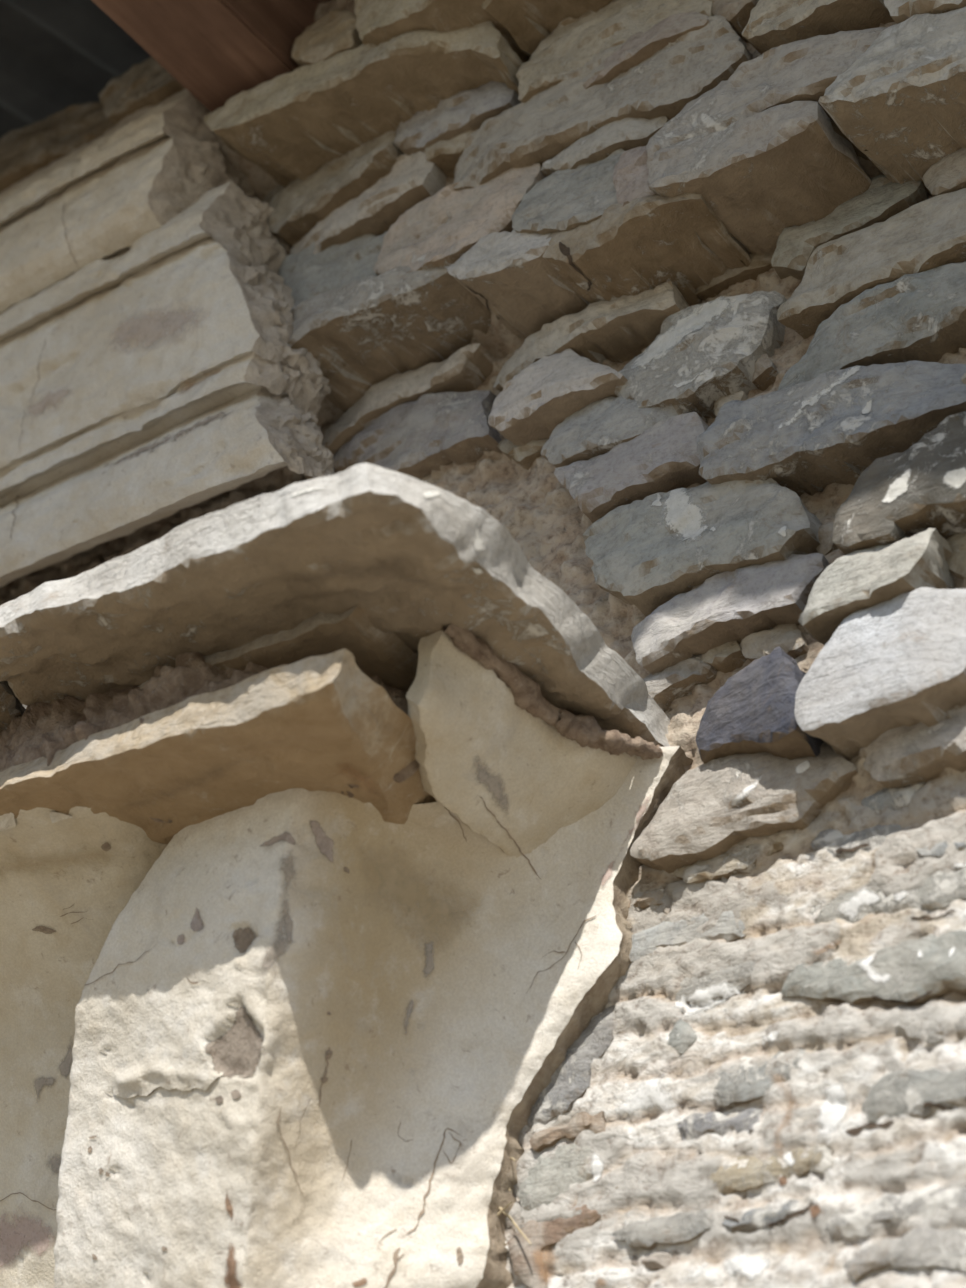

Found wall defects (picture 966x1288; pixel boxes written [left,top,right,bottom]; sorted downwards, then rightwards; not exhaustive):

crack [443,794,540,878]
crack [526,915,597,993]
spalling [205,1006,265,1104]
crack [381,1122,461,1288]